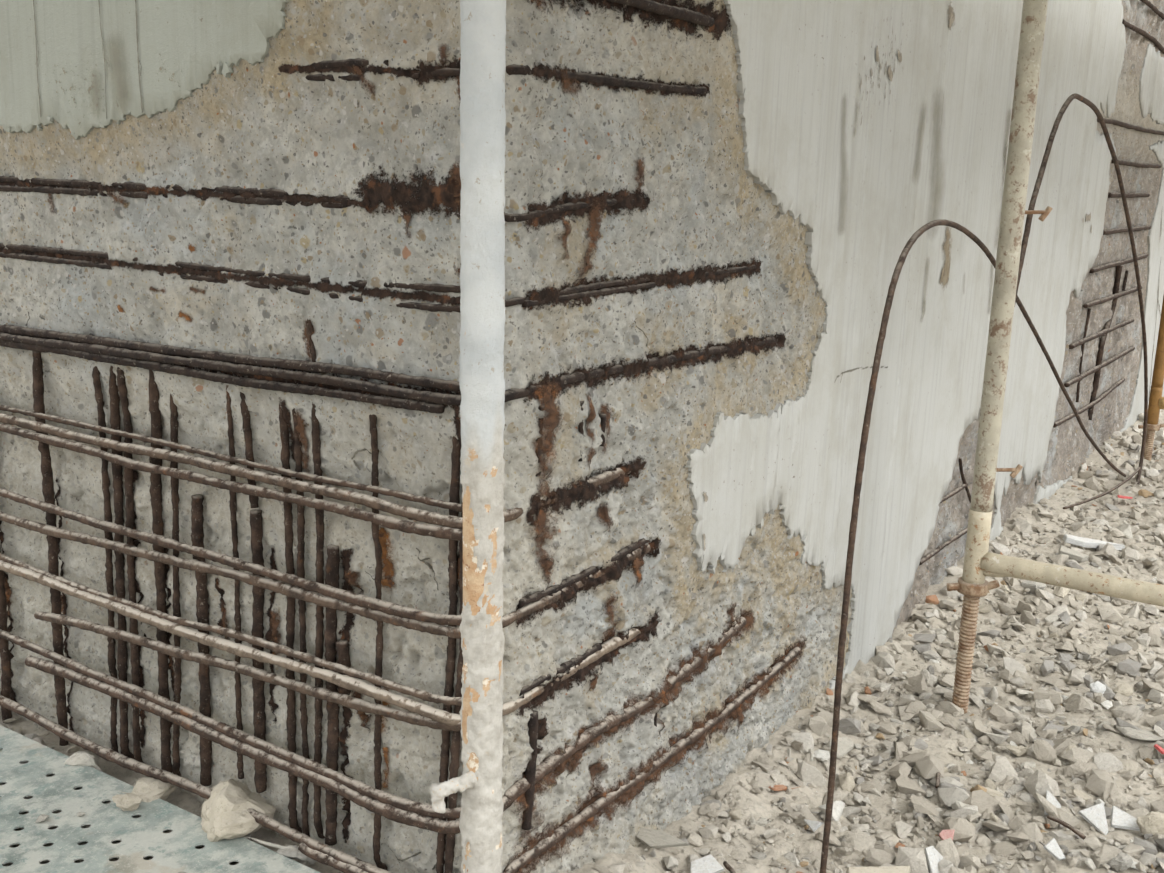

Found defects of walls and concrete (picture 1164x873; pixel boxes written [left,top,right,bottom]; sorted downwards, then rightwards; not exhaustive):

rust [278,44,461,100]
rust [0,163,461,238]
spalling [991,0,1164,528]
spalling [0,0,463,873]
rust [159,320,462,472]
spalling [501,0,996,873]
rust [214,578,230,640]
rust [265,548,281,724]
rust [340,548,364,593]
rust [507,332,807,873]
rust [338,688,390,779]
rust [341,797,351,843]